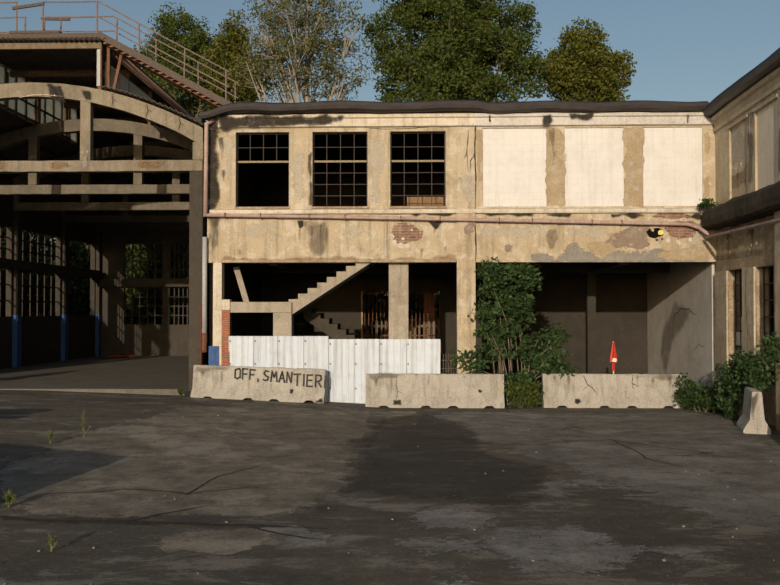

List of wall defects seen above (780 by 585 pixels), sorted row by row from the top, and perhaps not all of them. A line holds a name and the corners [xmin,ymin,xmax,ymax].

peeling [545,127,566,205]
peeling [622,127,645,207]
flaking render [389,221,424,248]
flaking render [531,213,707,262]